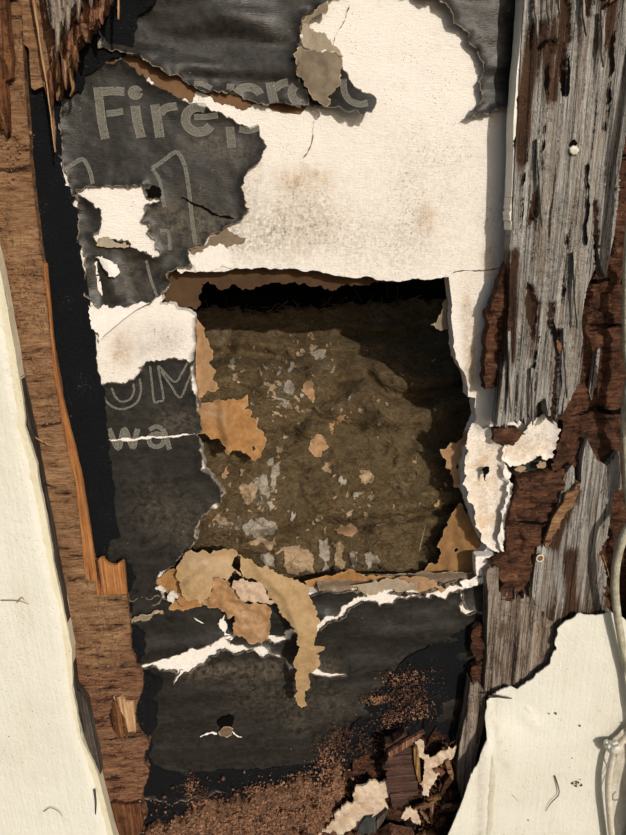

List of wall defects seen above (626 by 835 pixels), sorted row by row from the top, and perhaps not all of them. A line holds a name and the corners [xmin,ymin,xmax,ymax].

crack [182,197,239,219]
peeling [155,584,179,603]